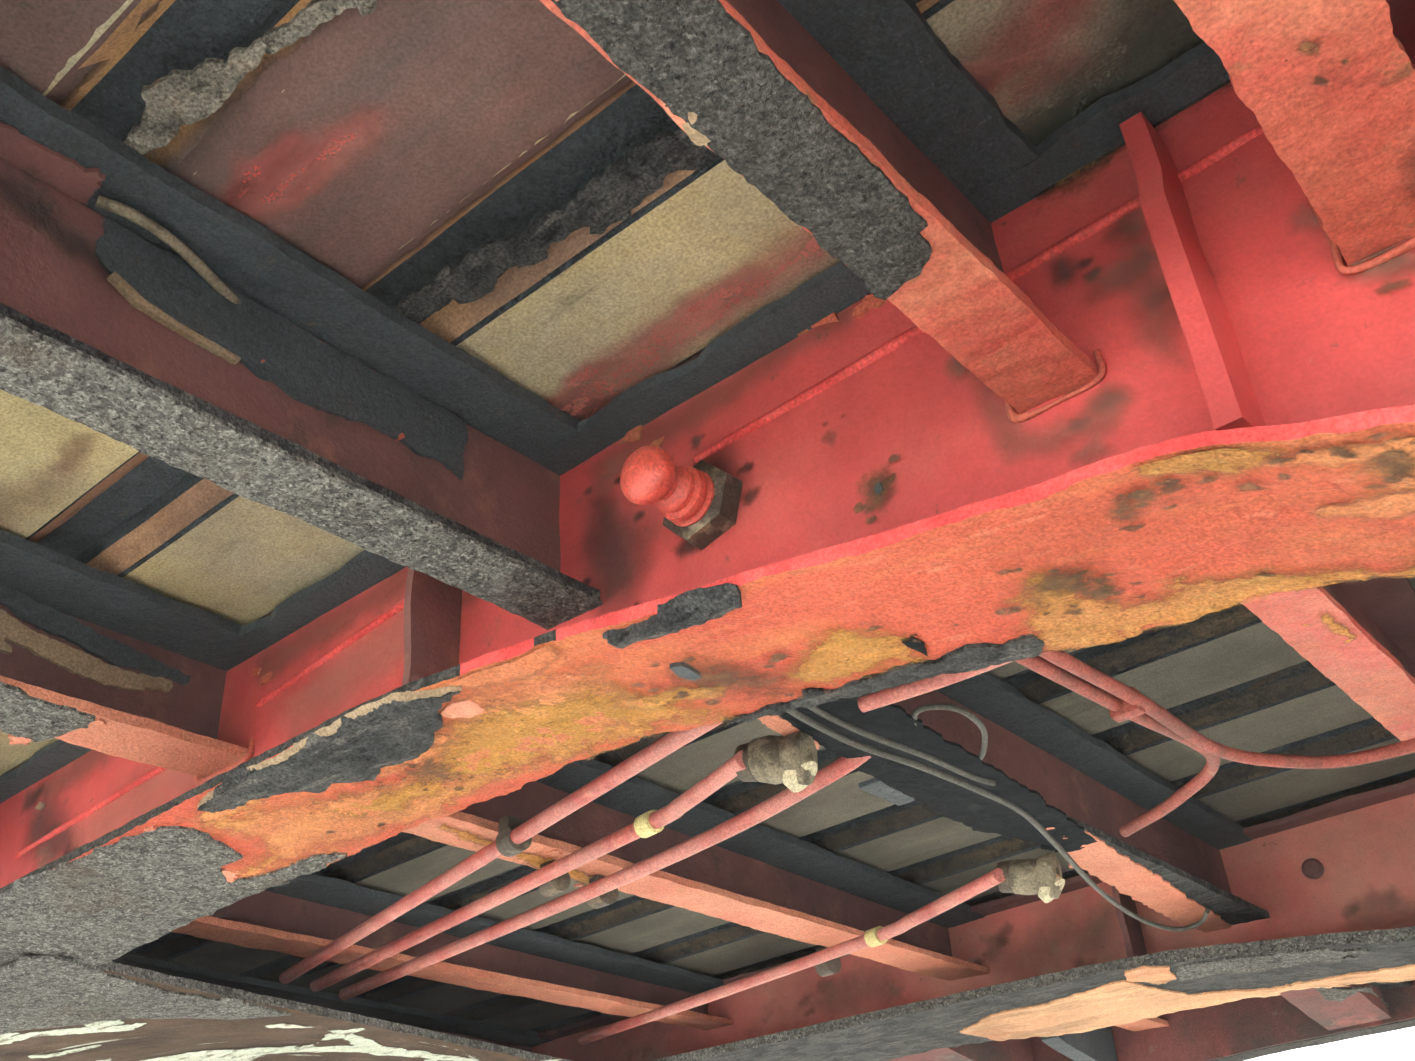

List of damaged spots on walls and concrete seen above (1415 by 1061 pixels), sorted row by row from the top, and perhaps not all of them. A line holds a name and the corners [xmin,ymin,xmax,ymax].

peeling [140,58,224,122]
peeling [682,112,711,146]
peeling [454,279,498,304]
peeling [2,183,468,480]
rust [0,313,1415,1035]
spalling [197,685,484,813]
peeling [960,964,1415,1041]